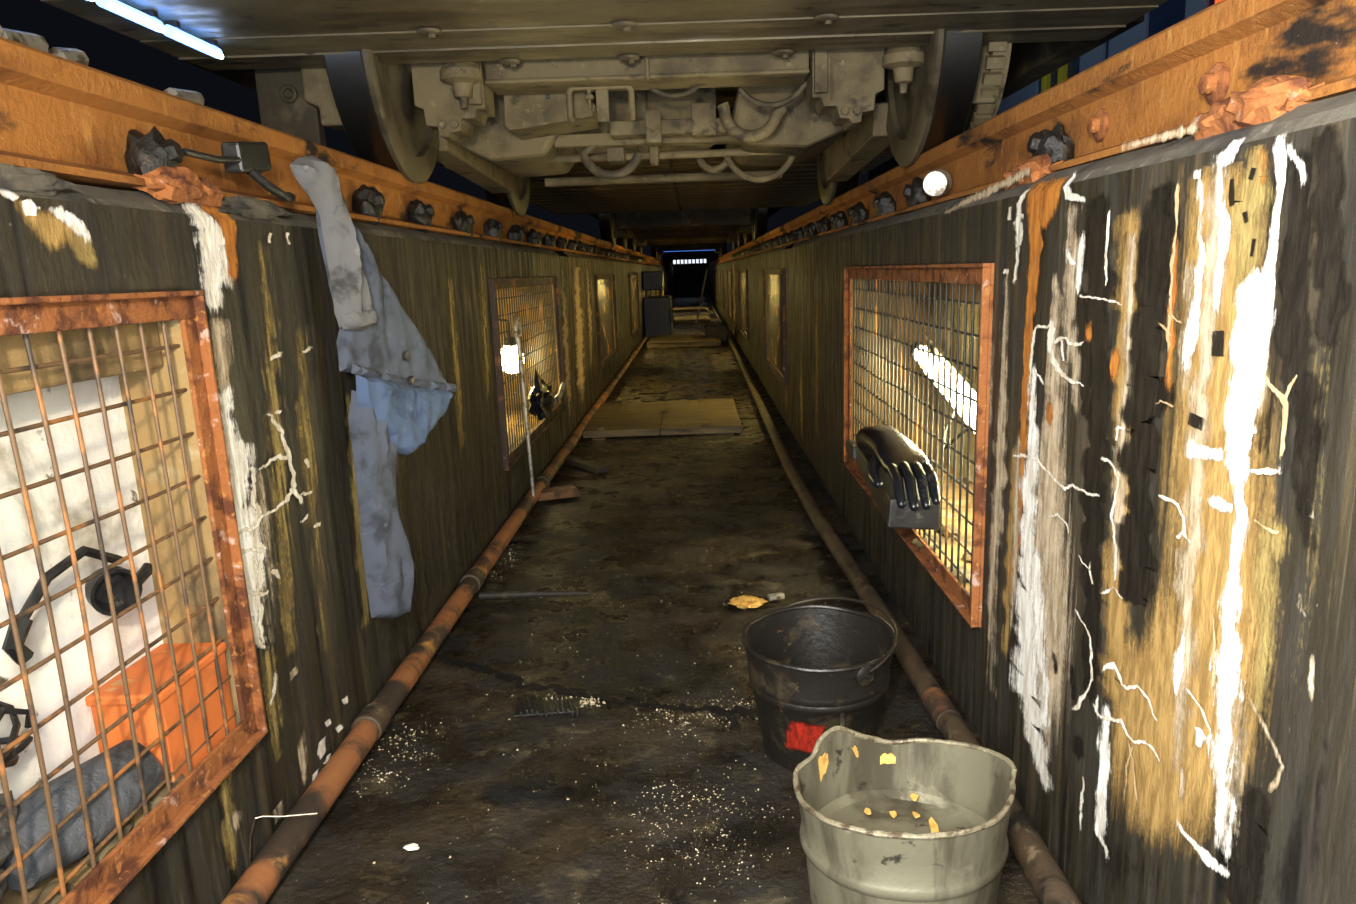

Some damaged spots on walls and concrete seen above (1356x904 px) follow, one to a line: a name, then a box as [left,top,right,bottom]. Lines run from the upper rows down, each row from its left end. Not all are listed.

rust [1009,177,1068,596]
crack [1029,319,1084,386]
rust [1110,349,1120,383]
crack [1265,375,1298,456]
water stain [181,202,321,758]
crack [239,413,312,649]
water stain [987,135,1305,878]
crack [1159,495,1191,544]
crack [1012,426,1160,801]
crack [1186,612,1216,737]
water stain [298,719,344,782]
water stain [220,772,239,869]